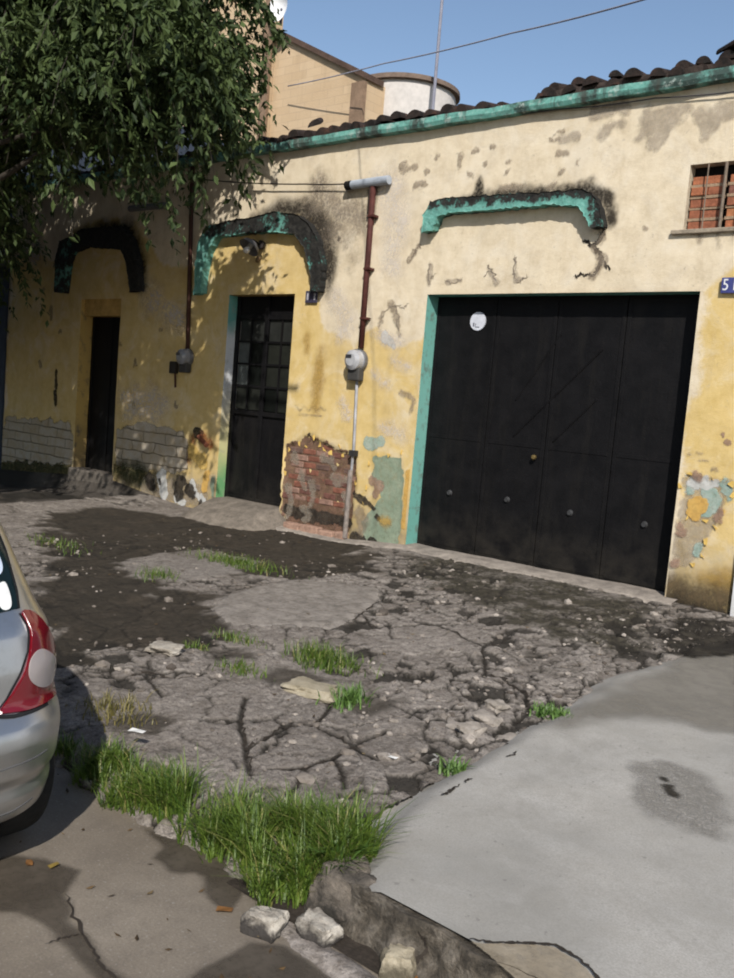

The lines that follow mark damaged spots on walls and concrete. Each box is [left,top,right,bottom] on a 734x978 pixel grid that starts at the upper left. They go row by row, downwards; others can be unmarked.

leakage [251,187,367,337]
crack [573,228,611,280]
spalling [145,427,215,506]
spalling [280,427,410,544]
peeling [670,468,734,567]
crack [348,594,384,629]
crack [89,671,200,695]
crack [442,627,547,724]
crack [225,699,385,796]
crack [441,778,473,795]
crack [45,895,118,978]